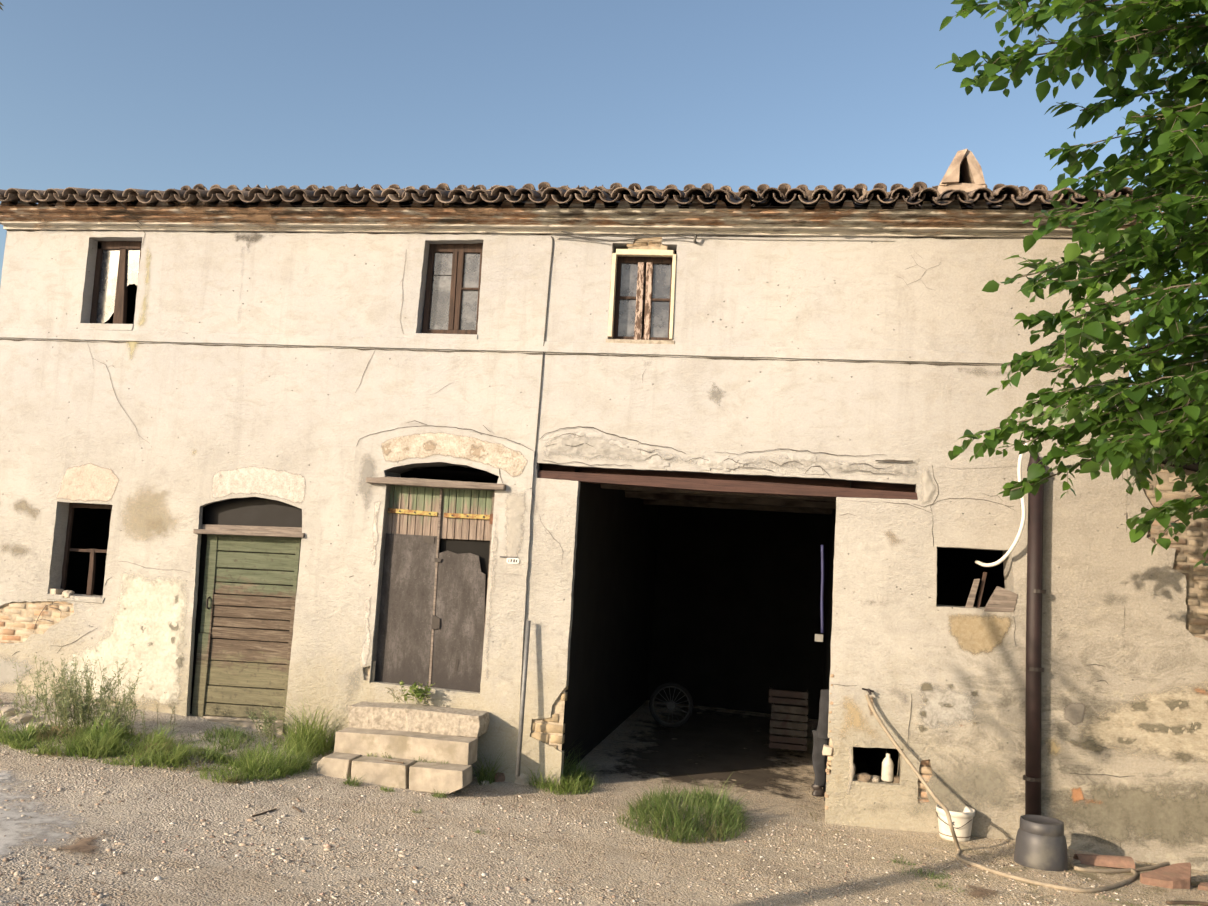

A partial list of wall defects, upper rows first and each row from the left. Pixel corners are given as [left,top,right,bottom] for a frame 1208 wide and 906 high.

crack [87,342,149,443]
spalling [0,601,74,643]
peeling [65,573,186,705]
spalling [949,614,1011,654]
spalling [530,686,568,751]
peeling [1064,681,1208,762]